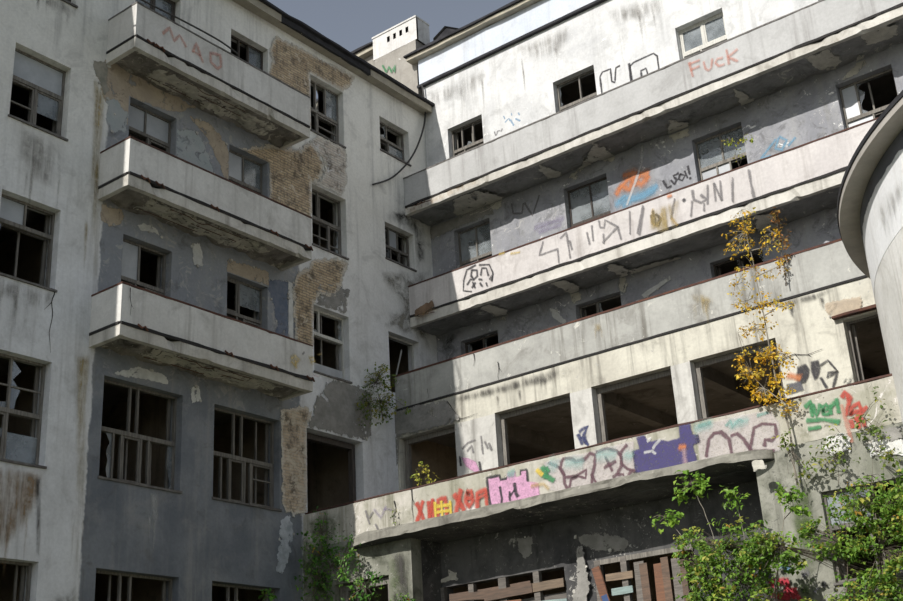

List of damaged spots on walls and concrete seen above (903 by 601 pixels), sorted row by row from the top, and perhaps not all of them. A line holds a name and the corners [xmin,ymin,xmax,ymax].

flaking render [269,36,355,96]
flaking render [93,60,348,216]
spalling [133,199,269,268]
flaking render [227,257,350,349]
peeling [190,385,202,403]
spalling [115,348,284,391]
flaking render [821,433,851,456]
flaking render [864,426,903,457]
rust [0,474,37,535]
flaking render [275,380,372,574]
peeling [572,531,629,601]